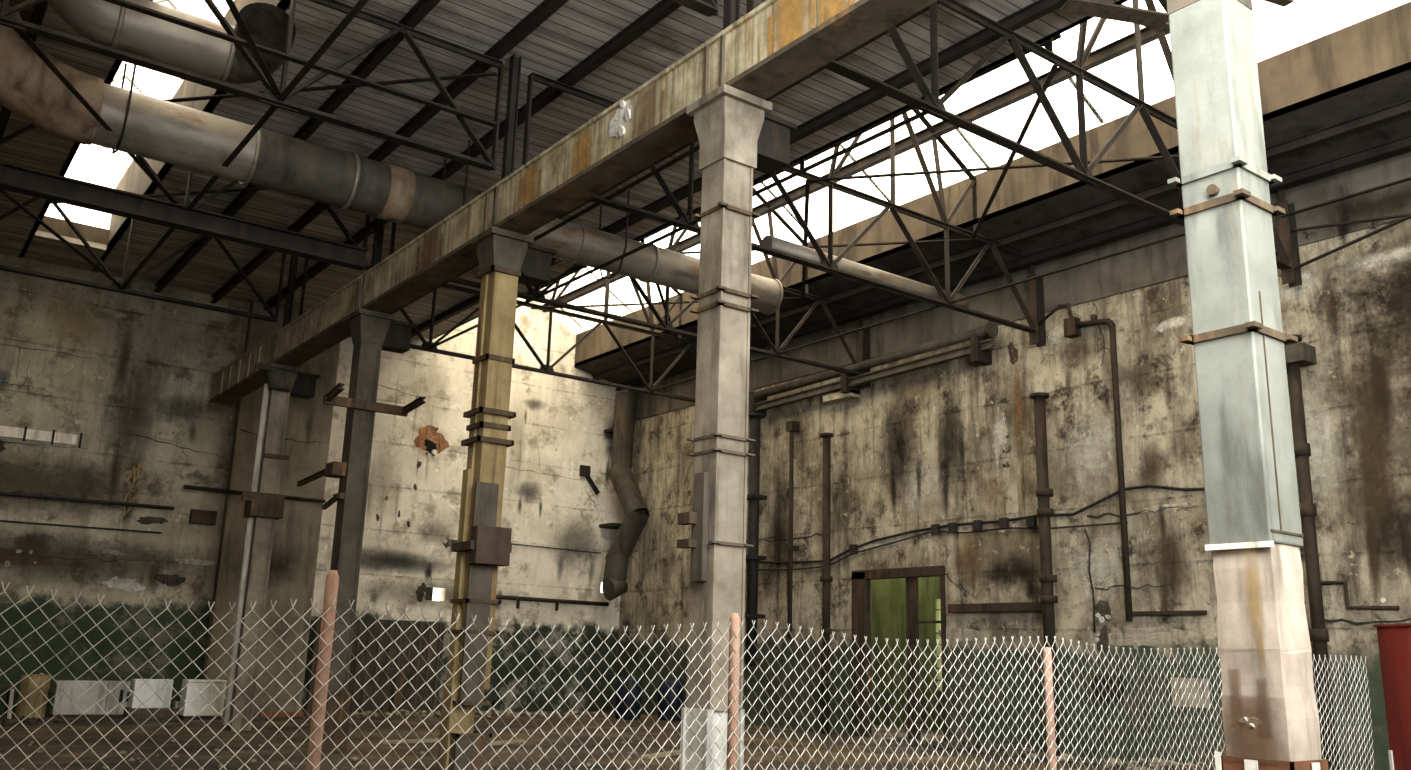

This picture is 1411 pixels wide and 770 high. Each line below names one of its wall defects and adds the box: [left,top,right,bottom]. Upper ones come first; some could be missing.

rust [768,0,854,56]
rust [573,129,591,176]
rust [633,85,664,138]
damp [888,421,920,504]
damp [940,400,964,508]
damp [1331,257,1411,589]